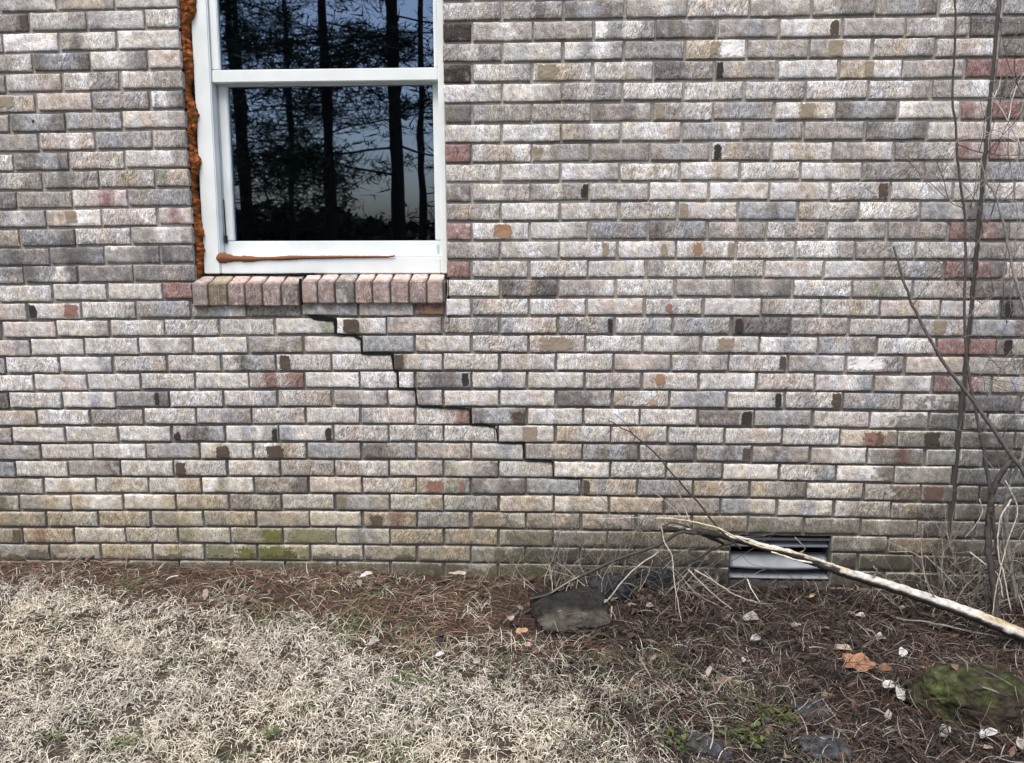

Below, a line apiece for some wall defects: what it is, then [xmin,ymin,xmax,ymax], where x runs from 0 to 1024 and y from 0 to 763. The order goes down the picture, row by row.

crack [273,273,580,495]